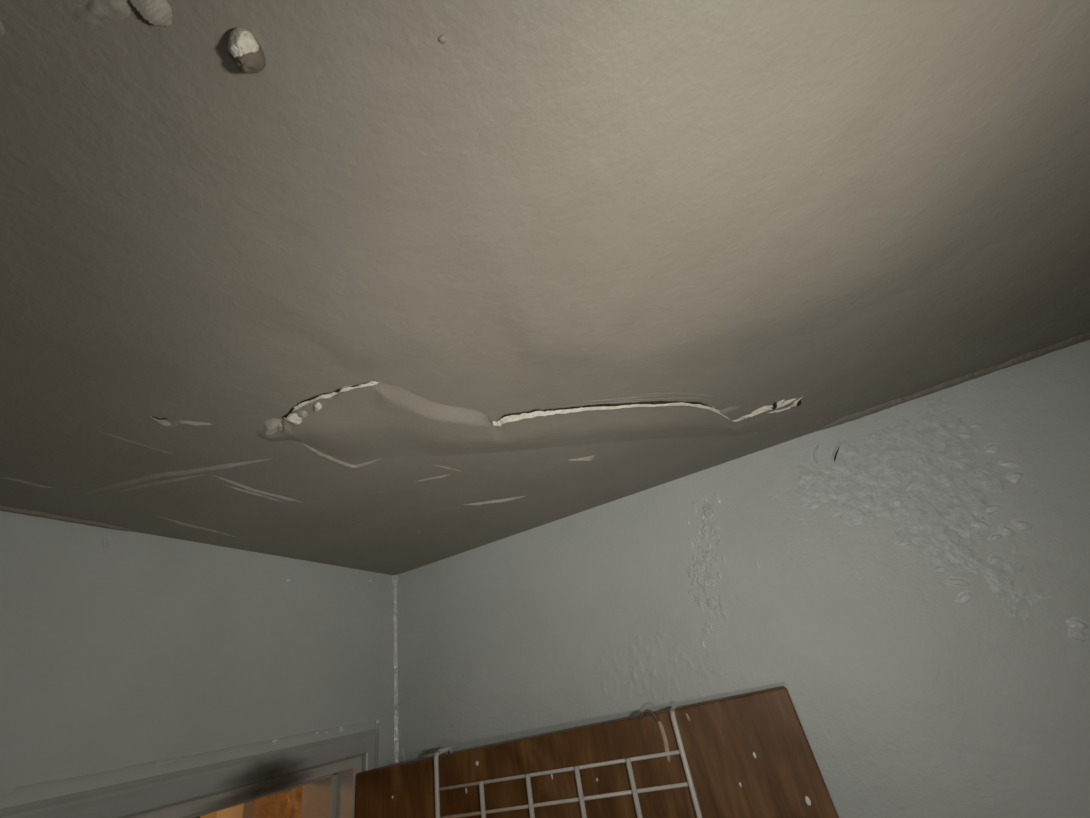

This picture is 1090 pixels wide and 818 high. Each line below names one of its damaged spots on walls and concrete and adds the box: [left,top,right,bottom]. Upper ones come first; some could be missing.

spalling [228,28,259,58]
crack [261,381,380,436]
crack [493,393,804,426]